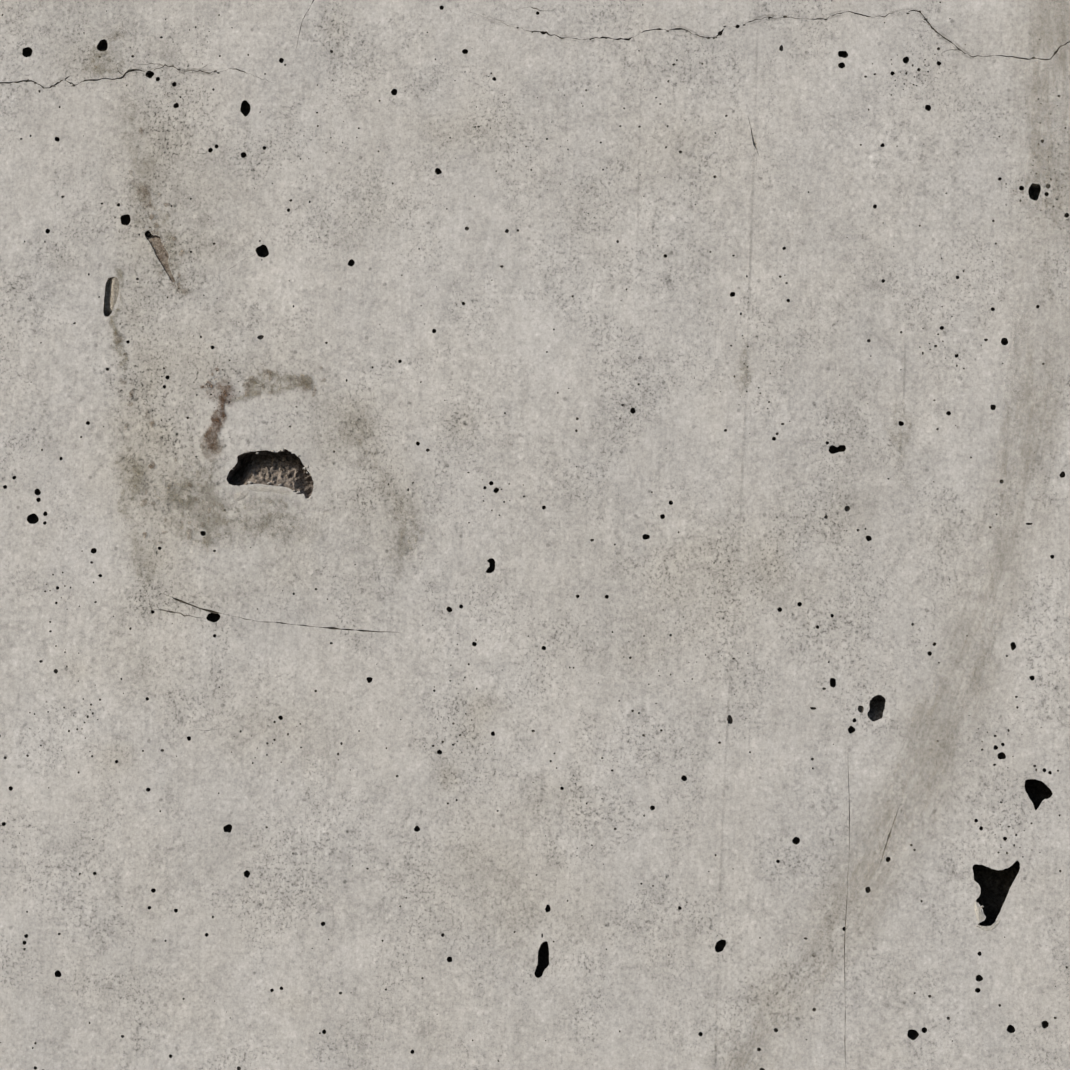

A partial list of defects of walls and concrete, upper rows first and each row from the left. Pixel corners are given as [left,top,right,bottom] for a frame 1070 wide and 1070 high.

crack [470,7,1070,60]
crack [0,60,272,89]
spalling [226,449,314,501]
spalling [1025,779,1053,810]
crack [843,772,851,977]
spalling [972,861,1020,931]